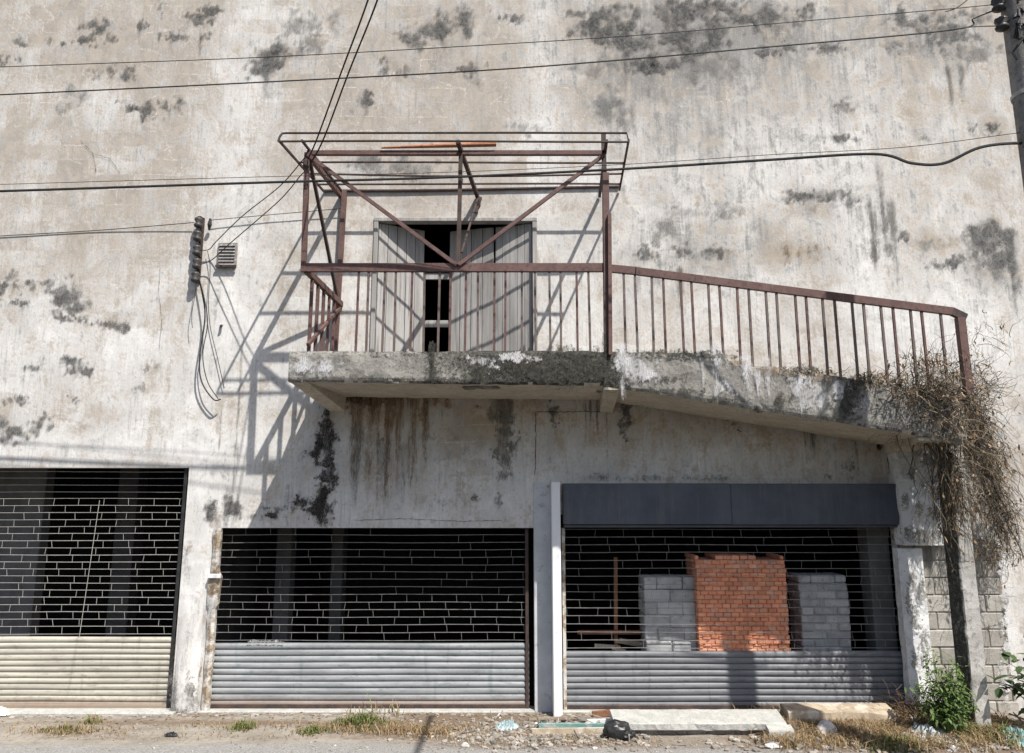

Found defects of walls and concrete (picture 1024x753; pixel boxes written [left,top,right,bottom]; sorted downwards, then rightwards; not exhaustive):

mould [248,13,338,80]
mould [566,0,827,82]
water stain [886,5,991,101]
water stain [786,188,909,264]
mould [934,218,1021,301]
mould [0,274,130,333]
mould [62,354,93,377]
mould [0,411,54,445]
water stain [205,397,448,527]
water stain [476,399,521,476]